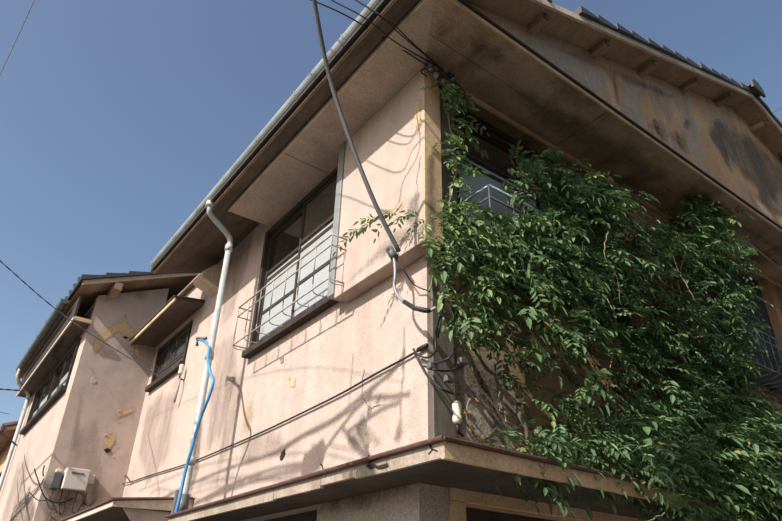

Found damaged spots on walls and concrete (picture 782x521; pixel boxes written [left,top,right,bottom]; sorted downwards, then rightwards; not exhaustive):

leakage [713,125,782,214]
peeling [104,430,116,453]